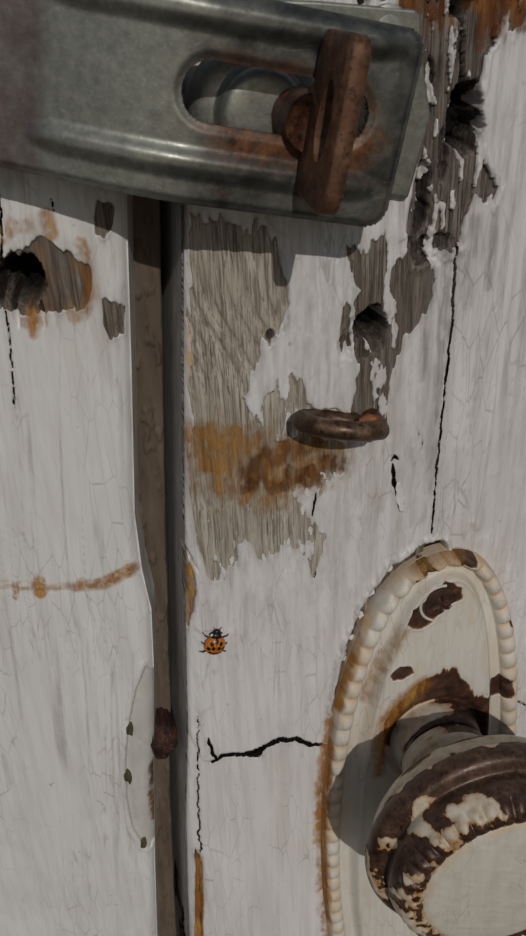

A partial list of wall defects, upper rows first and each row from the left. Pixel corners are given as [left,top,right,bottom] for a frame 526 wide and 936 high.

peeling [186,213,344,581]
peeling [339,233,435,423]
crack [431,213,459,533]
corrosion [185,424,346,508]
corrosion [33,577,46,598]
corrosion [78,565,138,588]
crack [196,716,323,852]
corrosion [316,651,357,936]
corrosion [375,680,429,776]